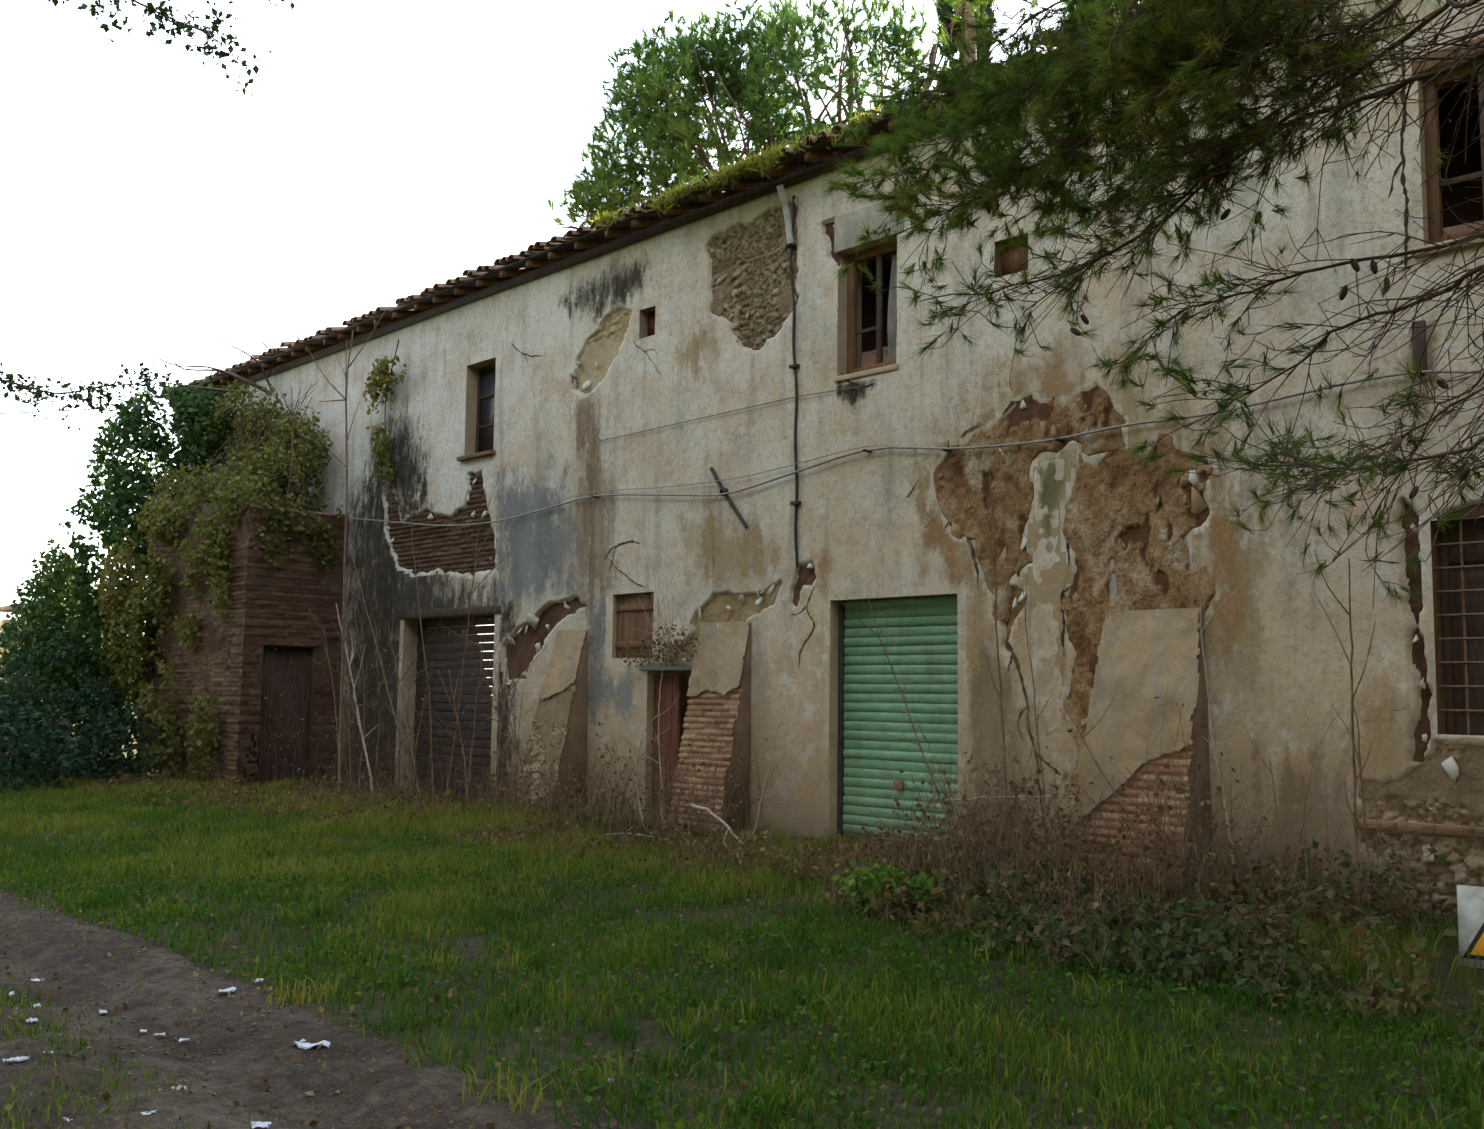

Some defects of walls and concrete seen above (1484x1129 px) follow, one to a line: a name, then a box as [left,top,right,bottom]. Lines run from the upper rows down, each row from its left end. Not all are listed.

spalling [707,198,799,350]
flaking render [569,308,632,394]
spalling [385,472,497,576]
spalling [506,597,587,679]
spalling [670,563,817,662]
flaking render [933,385,1216,825]
spalling [1359,734,1484,915]